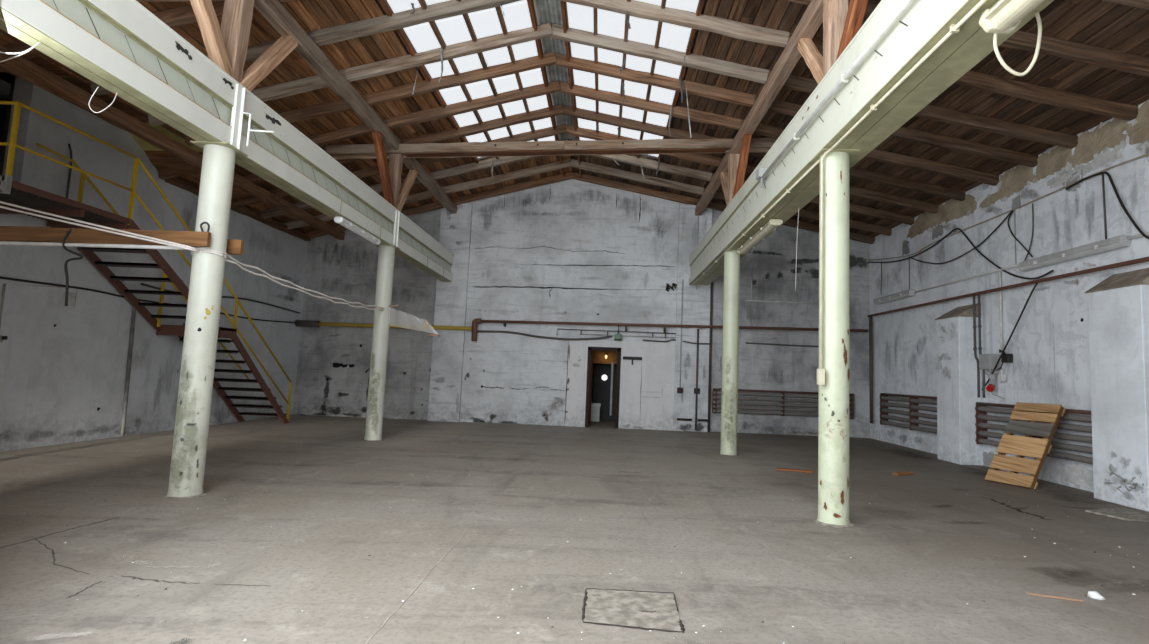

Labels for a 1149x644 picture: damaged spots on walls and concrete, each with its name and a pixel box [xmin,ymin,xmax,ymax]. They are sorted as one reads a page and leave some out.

spalling [904,99,1149,255]
crack [0,517,268,598]